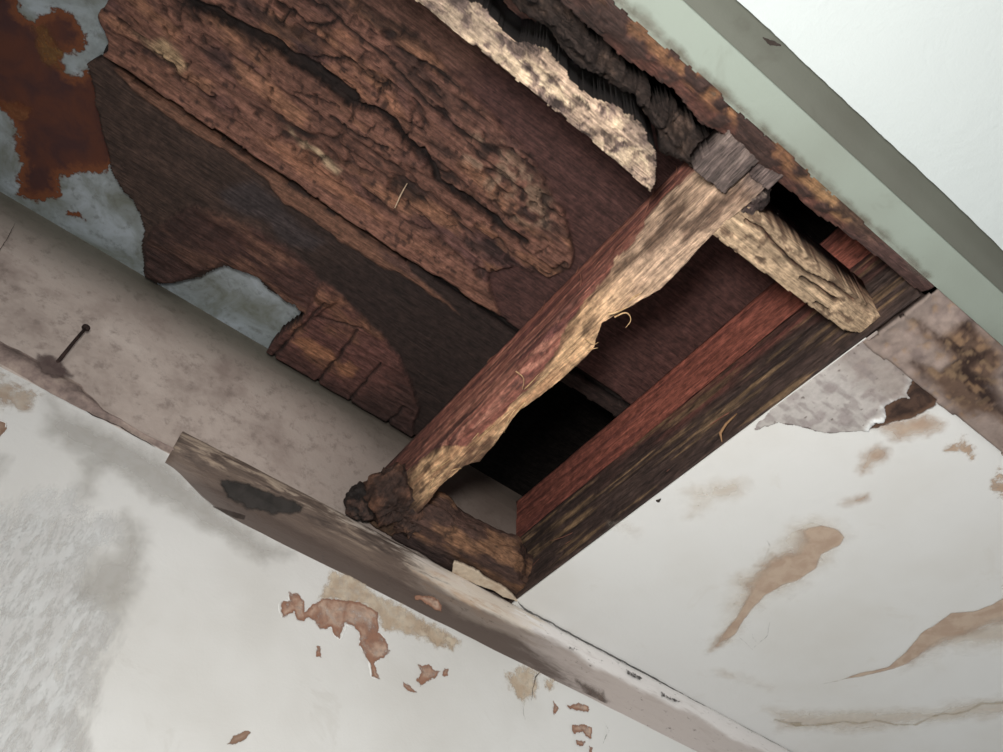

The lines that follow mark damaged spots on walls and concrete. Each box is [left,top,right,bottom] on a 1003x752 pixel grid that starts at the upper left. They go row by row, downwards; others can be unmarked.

rust [0,0,111,202]
peeling [755,331,913,433]
damp [884,416,937,437]
damp [945,442,974,459]
damp [221,480,302,514]
peeling [452,560,518,601]
damp [718,526,843,645]
peeling [278,592,390,680]
damp [849,599,1003,678]
peeling [403,664,449,692]
peeling [553,701,589,714]
peeling [572,724,593,752]